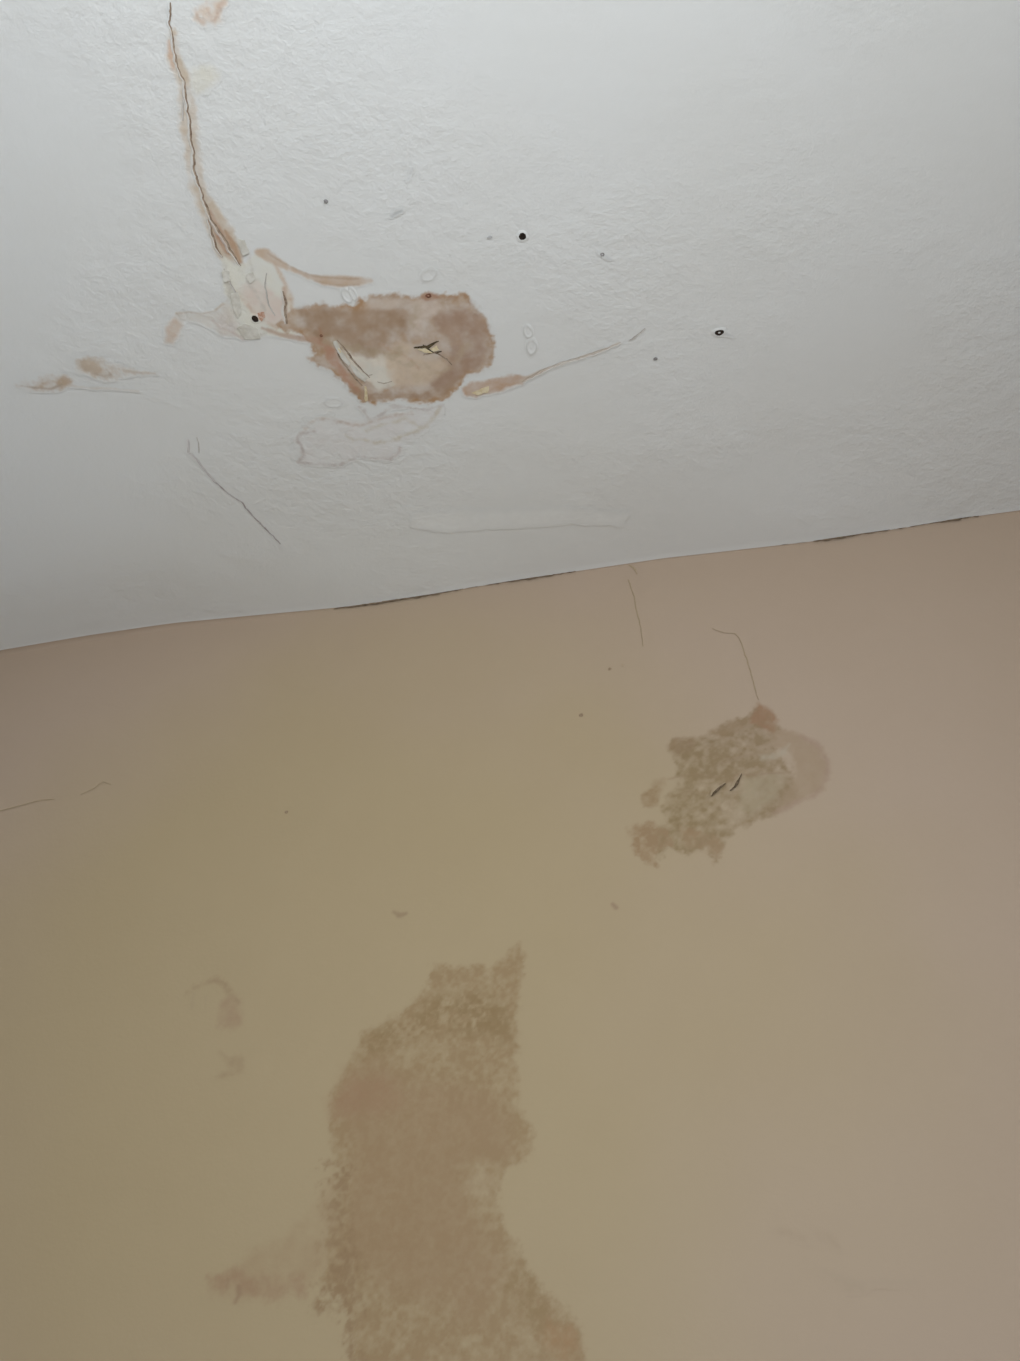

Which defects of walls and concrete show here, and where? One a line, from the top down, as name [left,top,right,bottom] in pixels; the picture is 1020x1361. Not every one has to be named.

crack [162,2,245,266]
leakage [13,353,159,394]
leakage [162,299,246,347]
peeling [219,239,296,341]
leakage [252,246,498,469]
crack [185,437,280,544]
crack [334,571,575,609]
leakage [623,700,834,870]
leakage [202,939,592,1361]